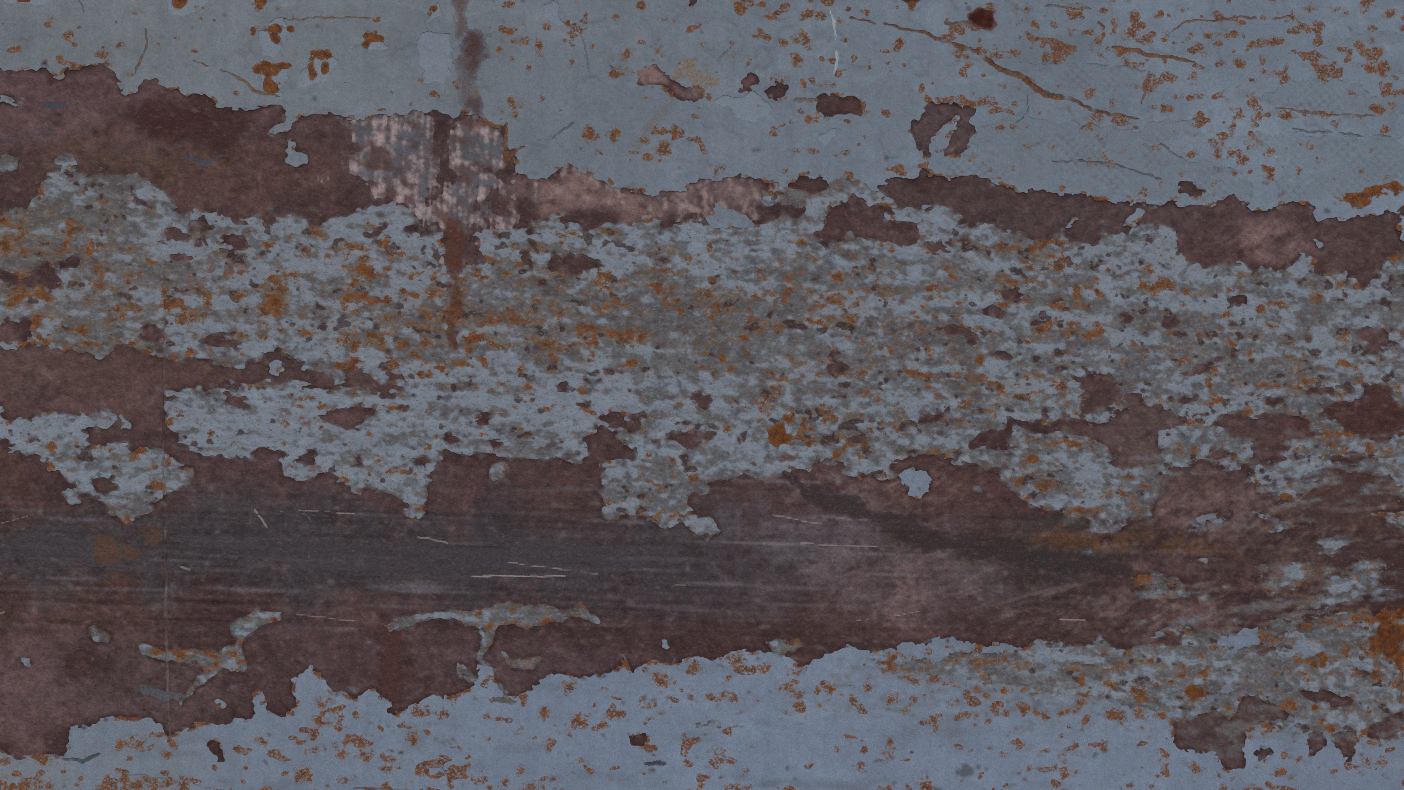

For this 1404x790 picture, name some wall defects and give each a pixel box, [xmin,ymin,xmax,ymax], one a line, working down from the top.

peeling [250,17,295,99]
peeling [300,49,339,86]
peeling [360,31,389,50]
peeling [417,2,453,86]
corrosion [450,0,492,122]
corrosion [967,7,1004,60]
corrosion [1339,180,1404,209]
corrosion [443,235,468,350]
peeling [0,63,1404,542]
corrosion [762,406,817,449]
peeling [0,410,1404,770]
corrosion [1357,605,1404,704]